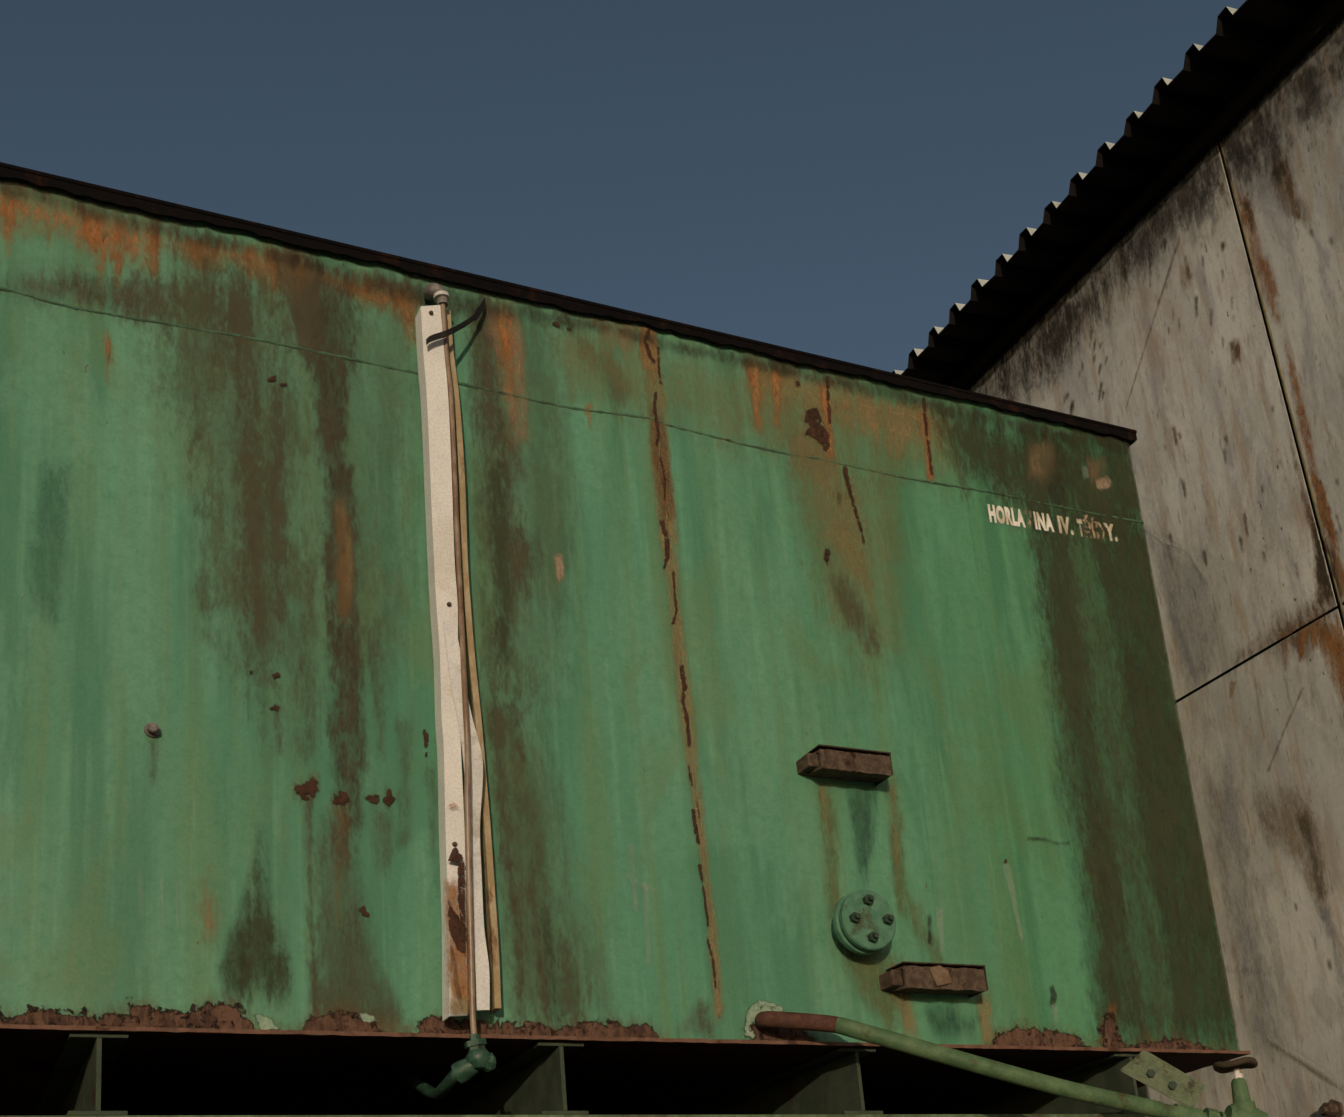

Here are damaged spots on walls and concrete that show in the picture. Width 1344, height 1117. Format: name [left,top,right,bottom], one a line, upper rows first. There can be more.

rust [0,190,161,282]
water stain [974,27,1344,400]
rust [747,363,950,581]
rust [1251,356,1344,685]
rust [294,777,395,855]
water stain [943,422,1247,1048]
rust [446,846,469,1014]